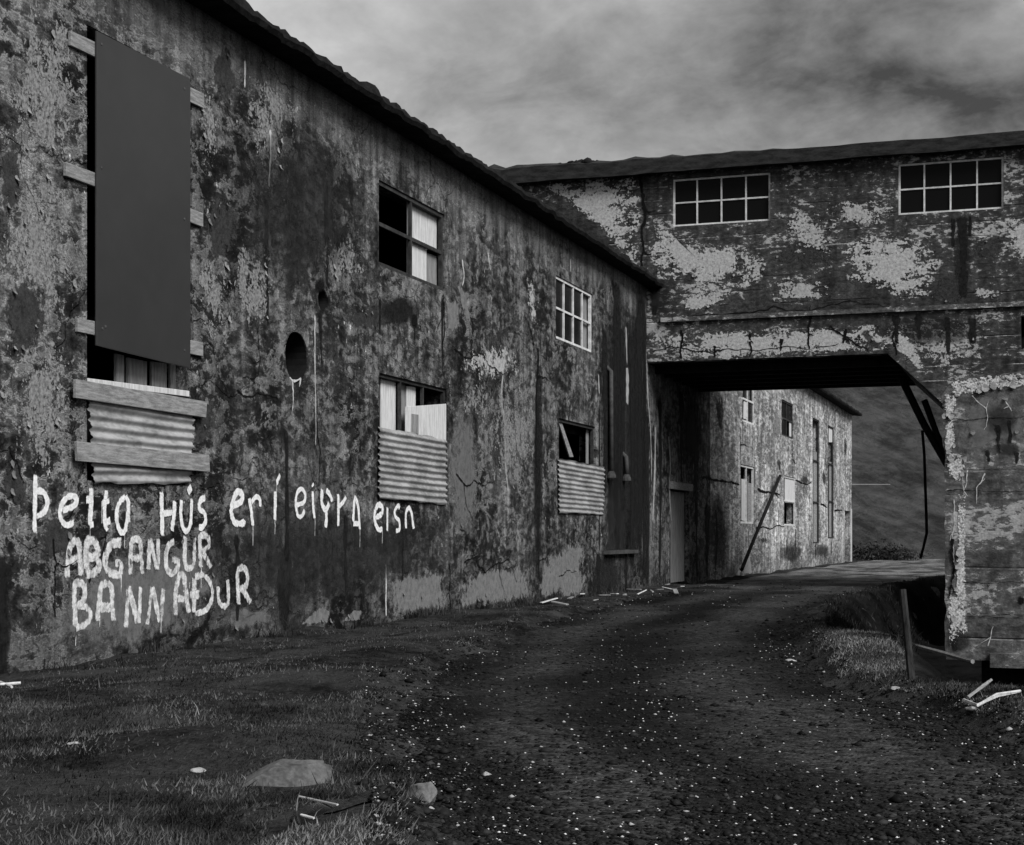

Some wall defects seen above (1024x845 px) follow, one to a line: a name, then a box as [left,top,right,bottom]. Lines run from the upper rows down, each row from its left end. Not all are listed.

water stain [249,130,346,323]
water stain [314,313,323,364]
water stain [379,298,417,338]
crack [638,175,656,266]
peeling [546,177,962,310]
crack [654,300,884,359]
water stain [951,216,972,297]
peeling [975,288,1003,299]
spalling [973,218,1024,260]
peeling [649,320,1024,640]